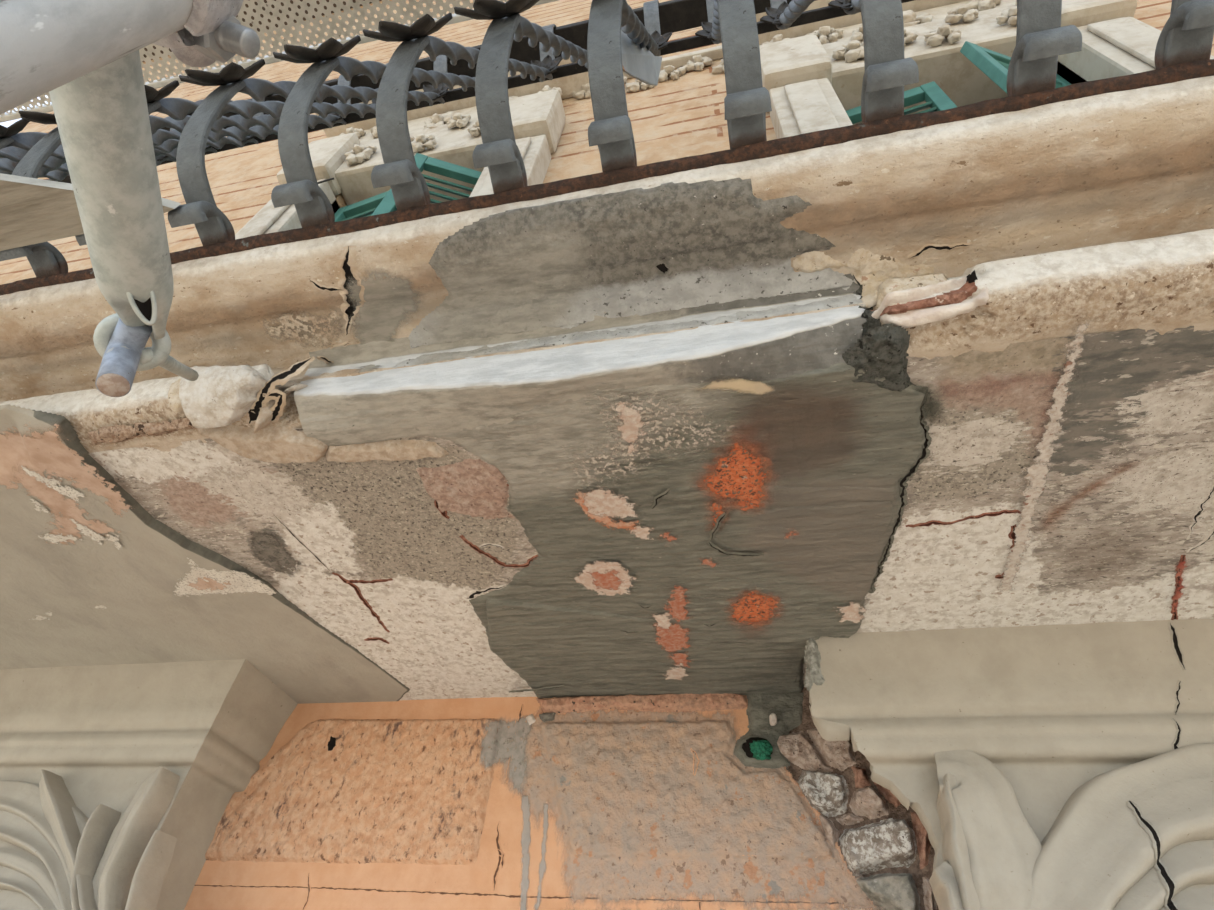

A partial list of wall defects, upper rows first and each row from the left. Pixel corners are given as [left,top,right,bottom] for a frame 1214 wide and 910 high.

crack [246,245,366,425]
spalling [793,248,989,328]
peeling [0,422,135,550]
peeling [173,557,277,597]
spalling [88,365,515,520]
crack [271,512,393,644]
crack [459,535,538,600]
crack [868,391,1021,593]
corrosion [1172,561,1187,613]
crack [1168,485,1214,750]
damp [481,709,877,910]
spalling [536,638,939,910]